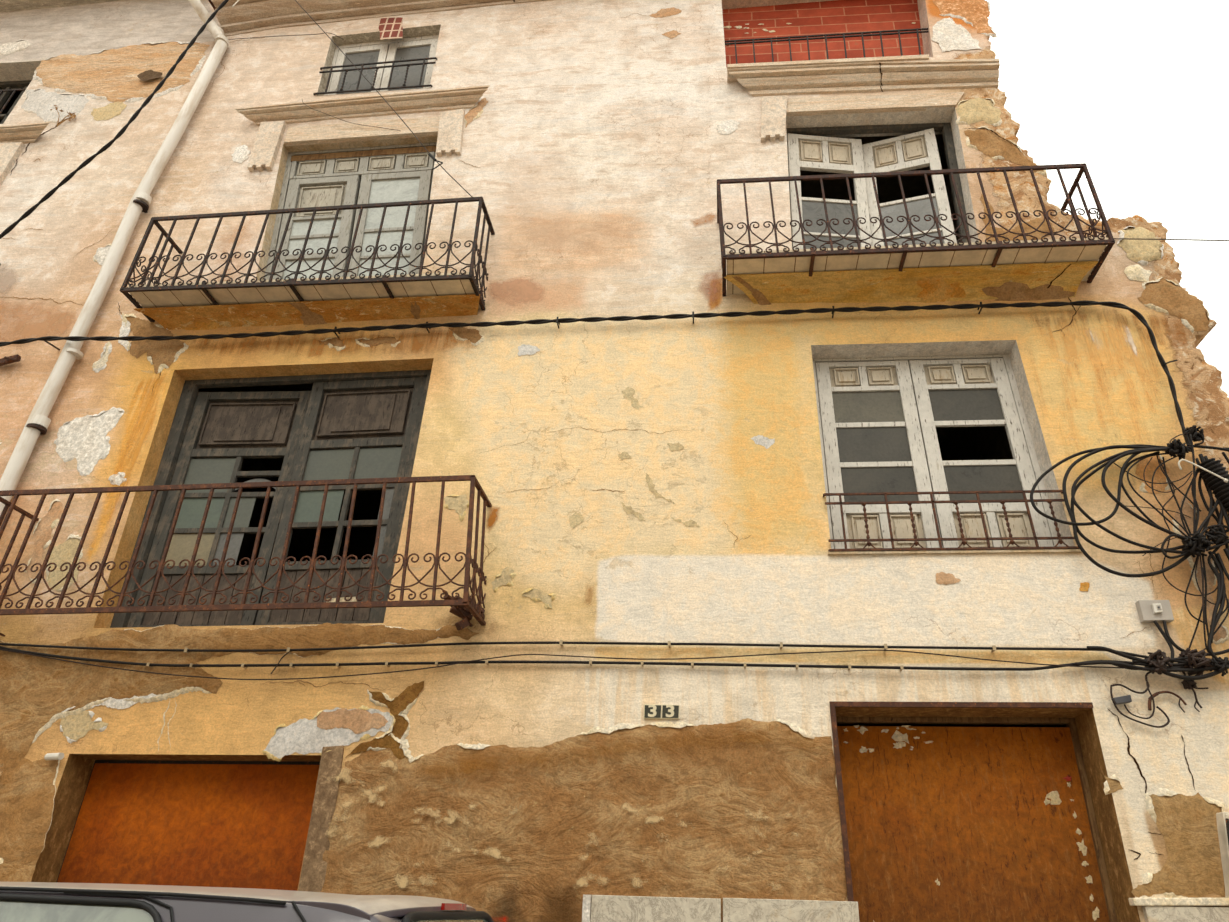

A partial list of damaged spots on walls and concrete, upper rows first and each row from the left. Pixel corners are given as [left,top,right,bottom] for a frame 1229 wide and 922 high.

flaking render [931,0,997,52]
flaking render [21,41,210,123]
flaking render [92,312,189,374]
flaking render [54,406,124,476]
flaking render [0,623,479,882]
flaking render [262,681,933,922]
crack [1107,708,1147,793]
crack [1182,737,1195,790]
flaking render [1131,788,1225,898]